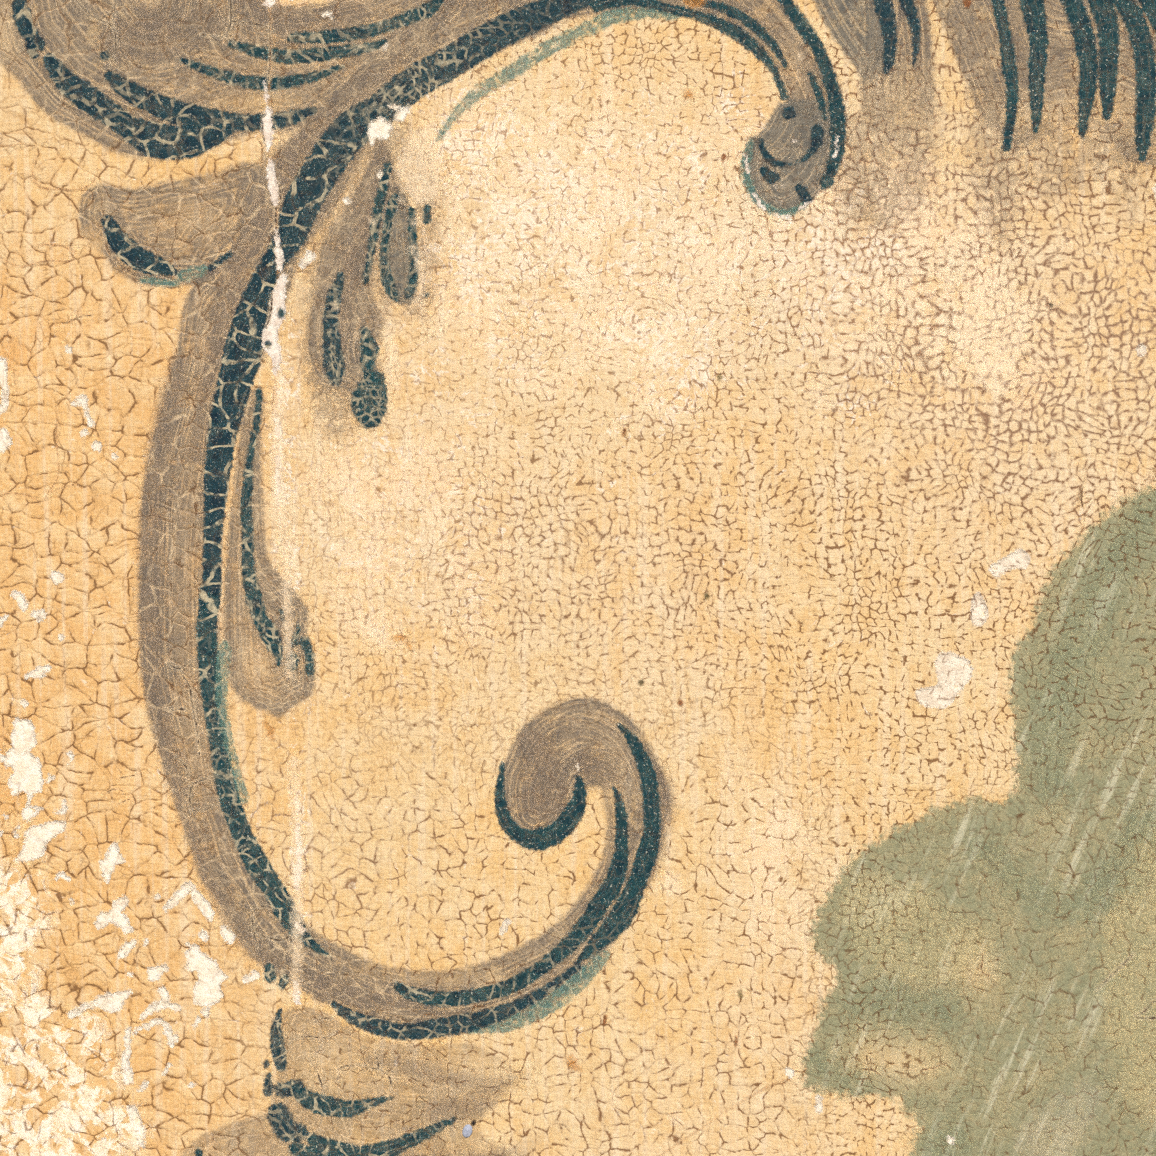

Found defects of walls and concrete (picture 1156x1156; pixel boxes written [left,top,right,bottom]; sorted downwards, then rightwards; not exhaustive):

crack [201,0,288,375]
peeling [0,356,13,453]
peeling [989,548,1030,577]
peeling [0,590,47,628]
peeling [24,664,51,680]
peeling [915,651,973,709]
crack [170,665,215,811]
crack [294,822,302,891]
peeling [0,699,260,1156]
crack [252,906,306,944]
crack [293,980,336,1038]
crack [317,1057,392,1086]